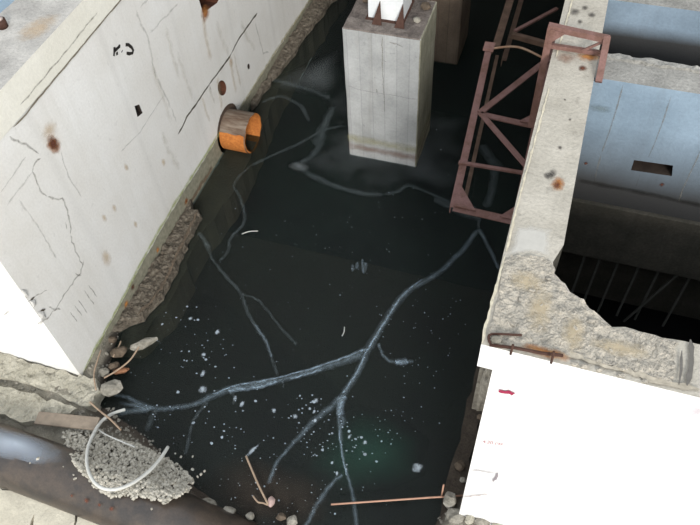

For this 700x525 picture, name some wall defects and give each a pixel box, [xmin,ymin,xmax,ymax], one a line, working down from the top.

crack [178,13,257,134]
spalling [482,89,700,390]